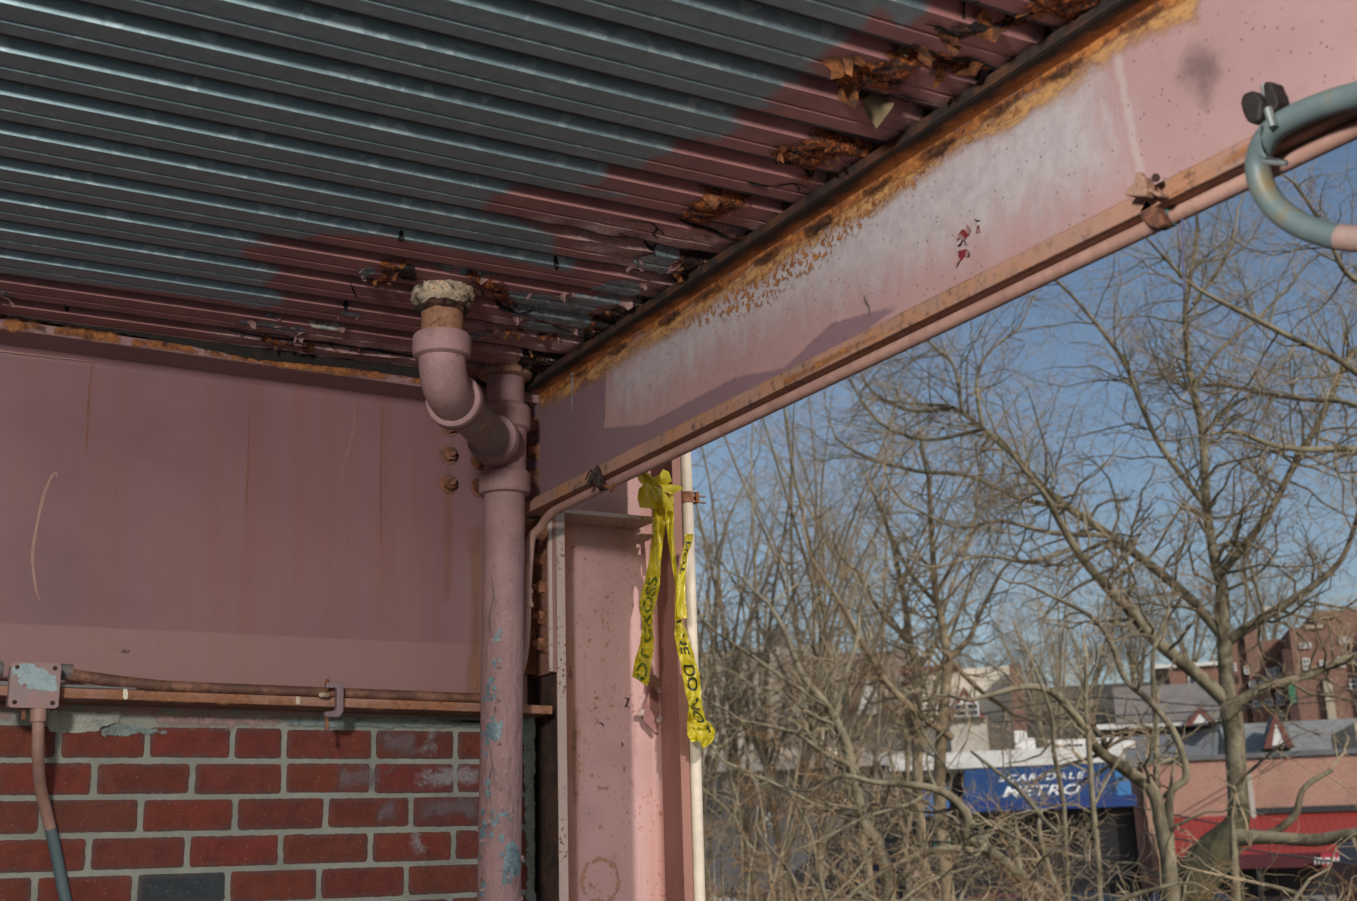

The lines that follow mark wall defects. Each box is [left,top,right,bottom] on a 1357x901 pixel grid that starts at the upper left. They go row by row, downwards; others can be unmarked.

corrosion [467,0,1197,406]
corrosion [0,319,421,384]
corrosion [369,258,416,287]
peeling [506,243,682,342]
peeling [480,628,503,758]
peeling [476,778,524,901]